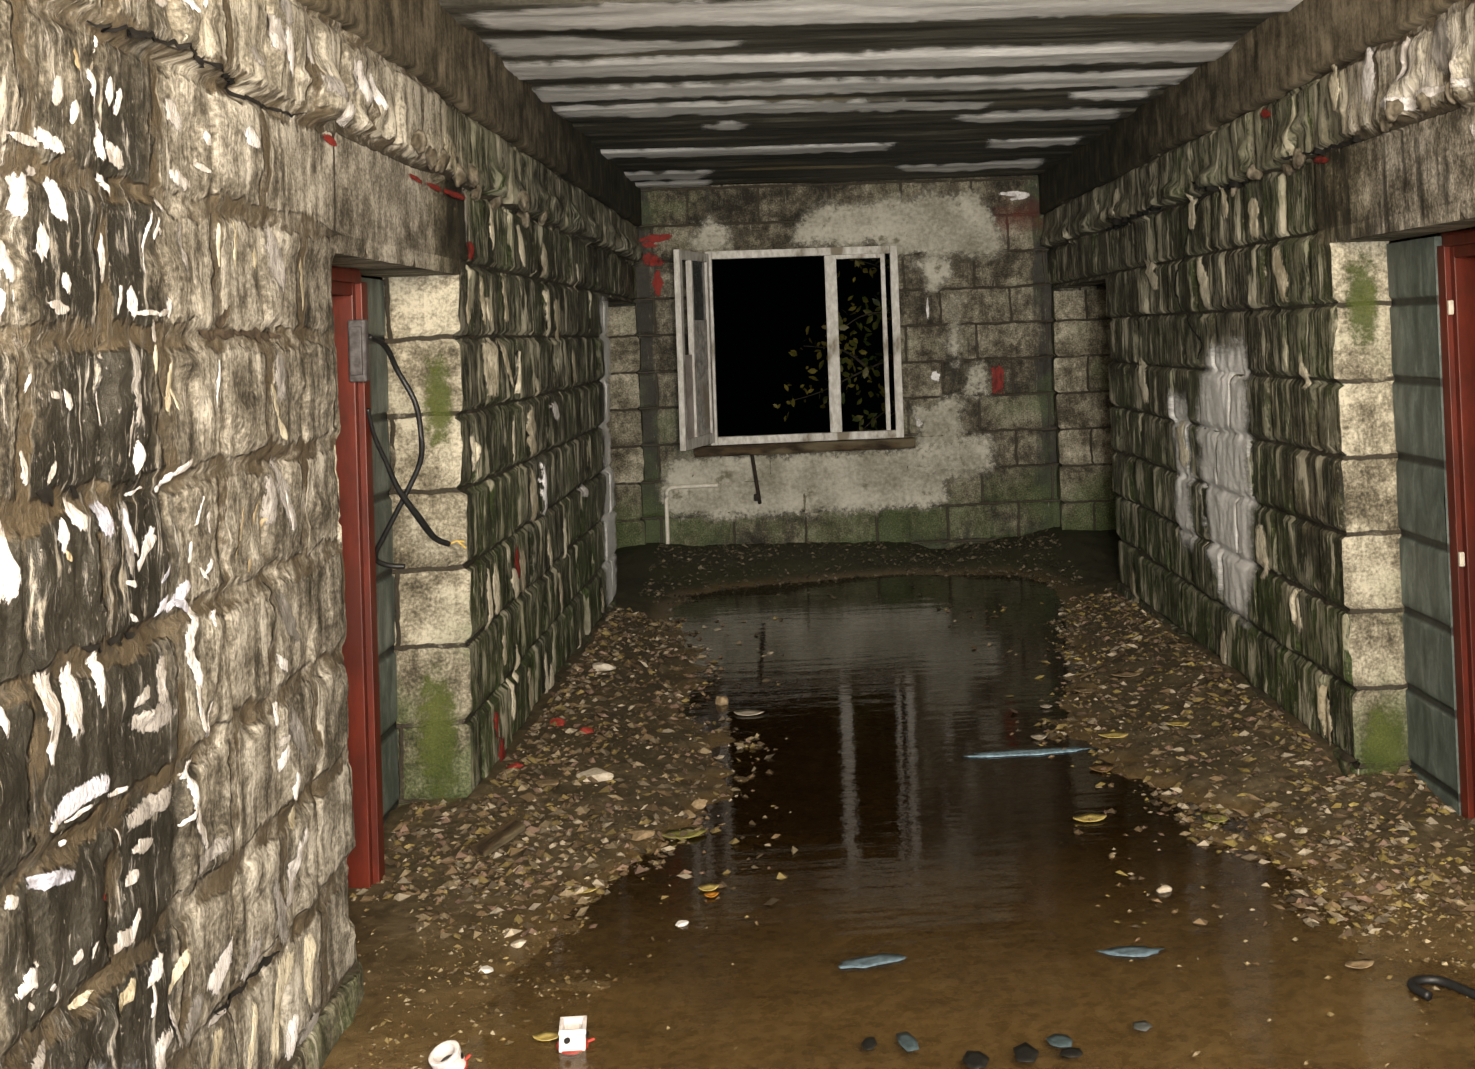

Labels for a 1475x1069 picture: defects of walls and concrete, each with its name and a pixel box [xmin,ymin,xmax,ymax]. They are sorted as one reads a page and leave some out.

flaking render [639,233,672,297]
flaking render [991,365,1004,394]